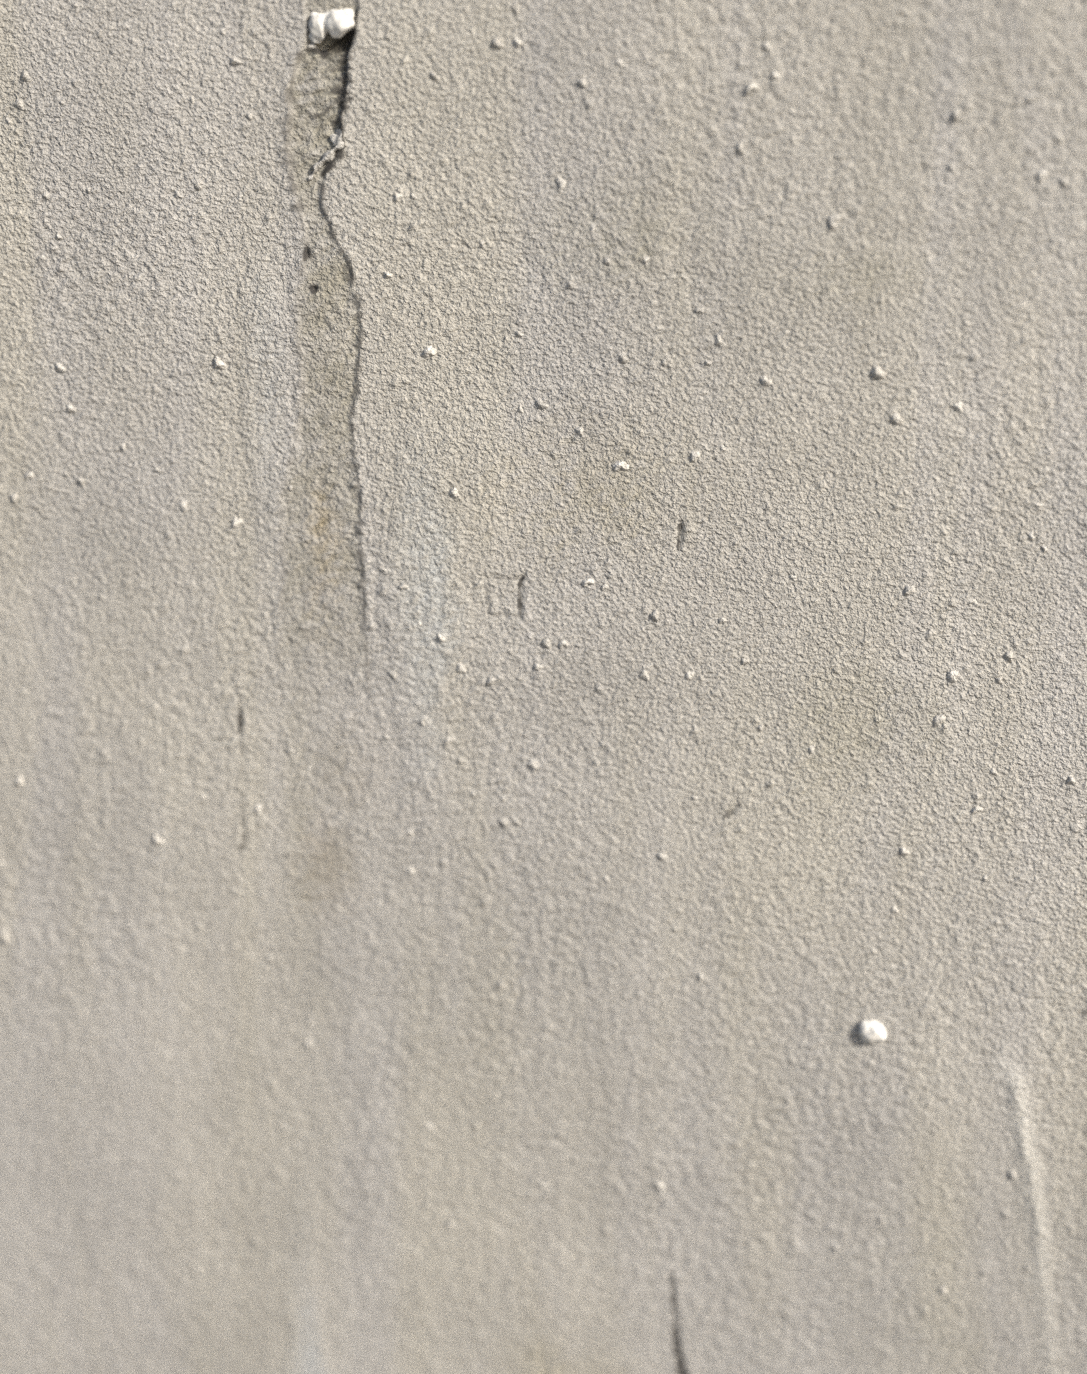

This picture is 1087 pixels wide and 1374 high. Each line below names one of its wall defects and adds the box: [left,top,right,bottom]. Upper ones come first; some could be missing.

peeling [271,0,377,1160]
crack [670,1272,686,1374]